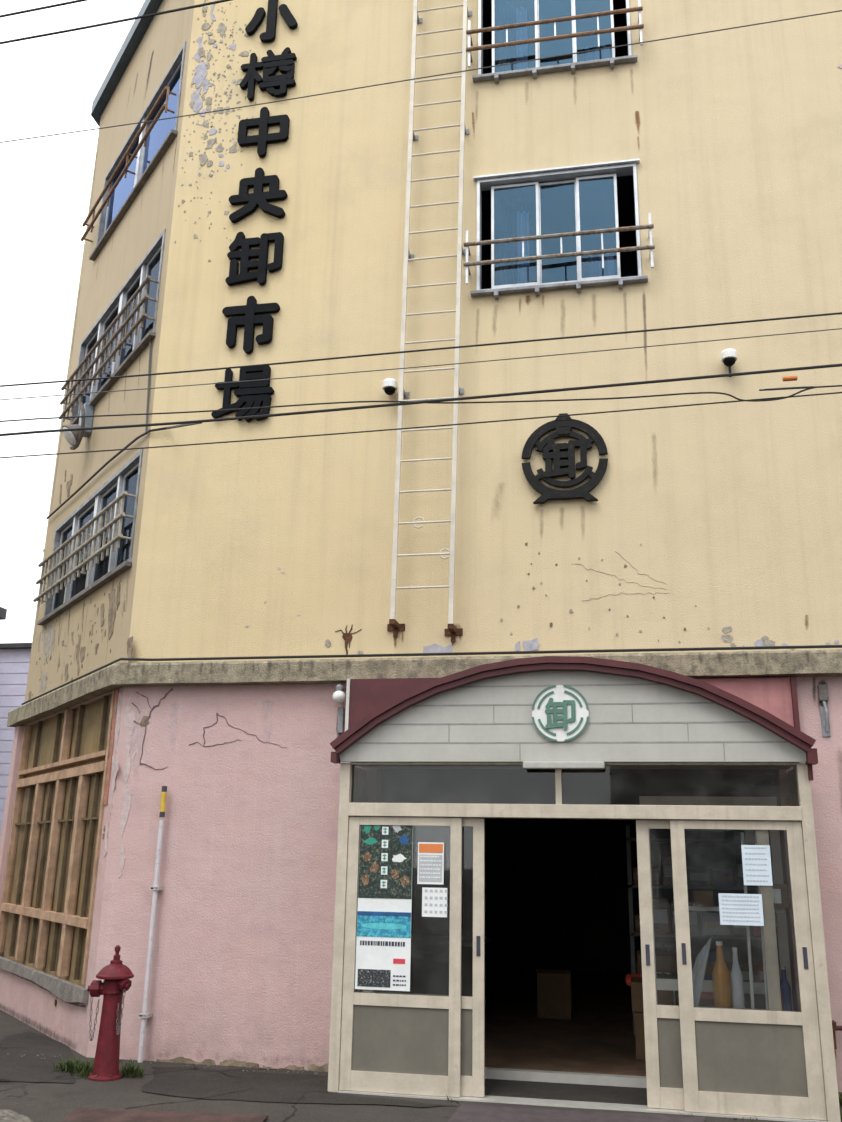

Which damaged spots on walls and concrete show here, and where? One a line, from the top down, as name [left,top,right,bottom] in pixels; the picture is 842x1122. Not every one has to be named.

peeling [178,0,256,241]
peeling [28,577,126,700]
corrosion [325,624,363,655]
peeling [707,626,795,650]
crack [132,688,173,770]
crack [189,713,287,748]